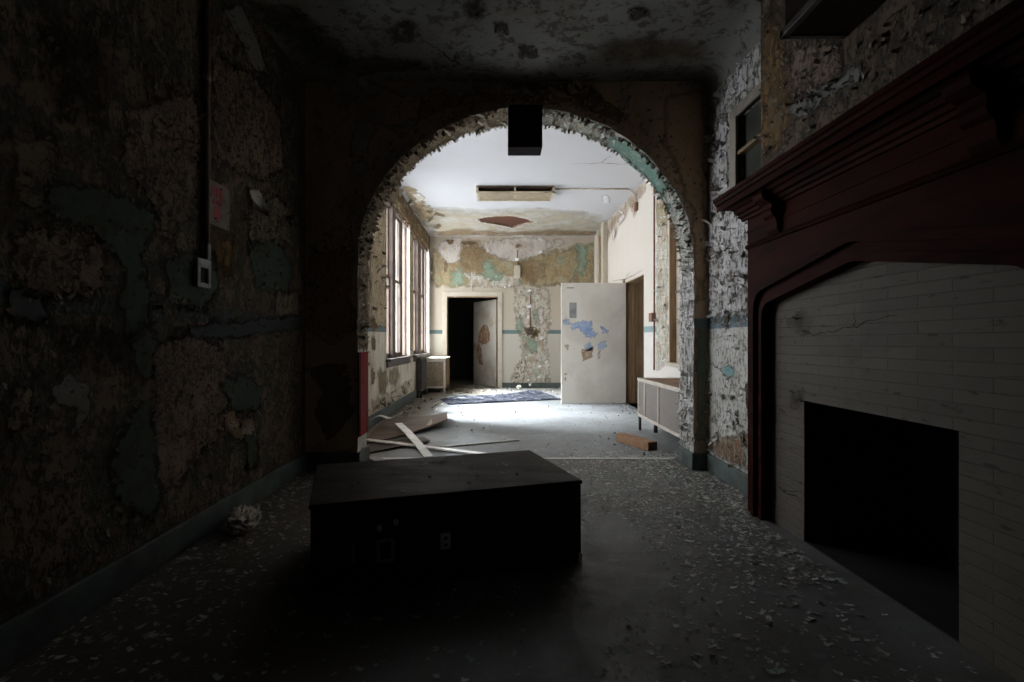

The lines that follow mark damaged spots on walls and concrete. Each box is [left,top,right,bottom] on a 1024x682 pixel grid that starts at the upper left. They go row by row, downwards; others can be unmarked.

flaking render [118,87,206,245]
peeling [247,189,295,255]
peeling [357,107,508,353]
leakage [397,197,635,288]
peeling [438,216,609,386]
peeling [542,0,977,469]